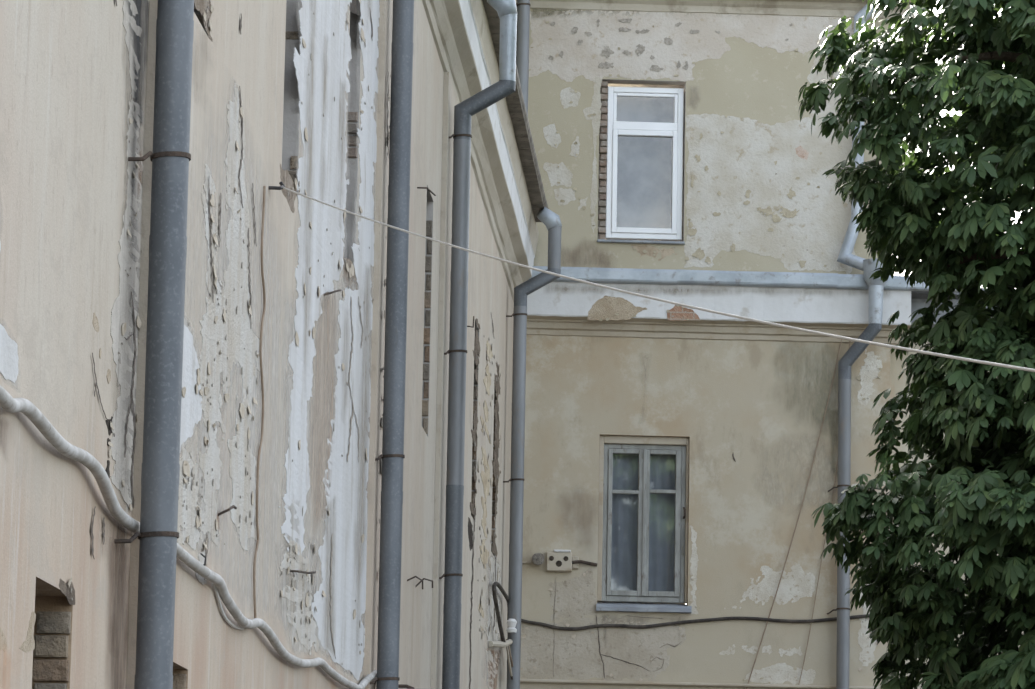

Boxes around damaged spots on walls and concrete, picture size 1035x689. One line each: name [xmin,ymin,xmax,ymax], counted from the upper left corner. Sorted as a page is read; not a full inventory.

peeling [529,10,855,274]
peeling [0,324,19,386]
peeling [177,88,260,585]
peeling [279,0,391,681]
spalling [587,296,647,321]
spalling [667,305,700,321]
peeling [856,349,882,406]
peeling [468,318,502,689]
peeling [724,564,817,609]
crack [596,616,681,678]